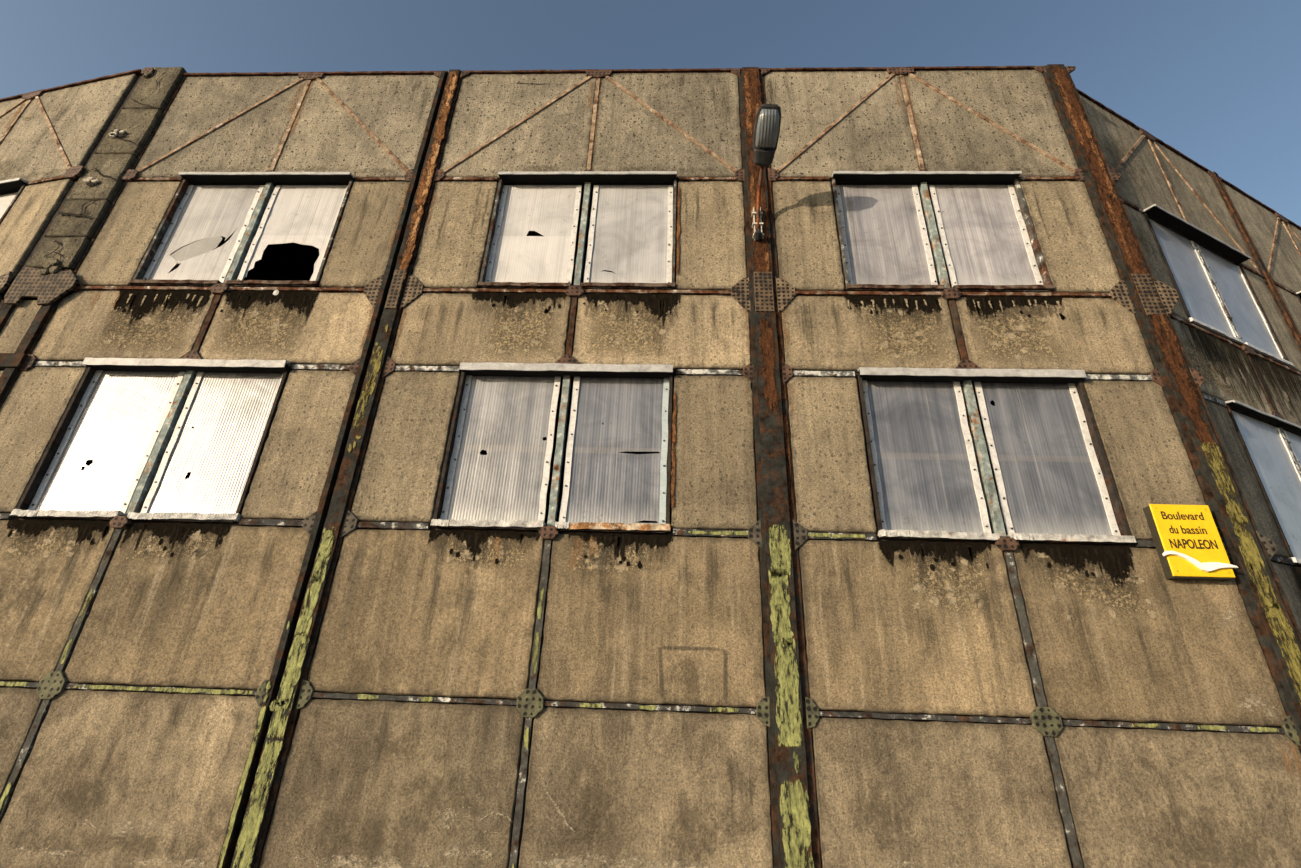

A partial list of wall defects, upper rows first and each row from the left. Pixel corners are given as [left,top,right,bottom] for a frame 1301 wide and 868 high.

corrosion [389,71,457,279]
corrosion [1051,66,1152,294]
damp [108,290,319,337]
damp [583,293,694,349]
corrosion [742,69,794,514]
damp [834,295,942,325]
corrosion [1218,177,1301,338]
corrosion [1148,315,1219,455]
damp [2,520,110,600]
damp [120,523,231,588]
damp [878,541,991,579]
damp [1020,544,1135,596]